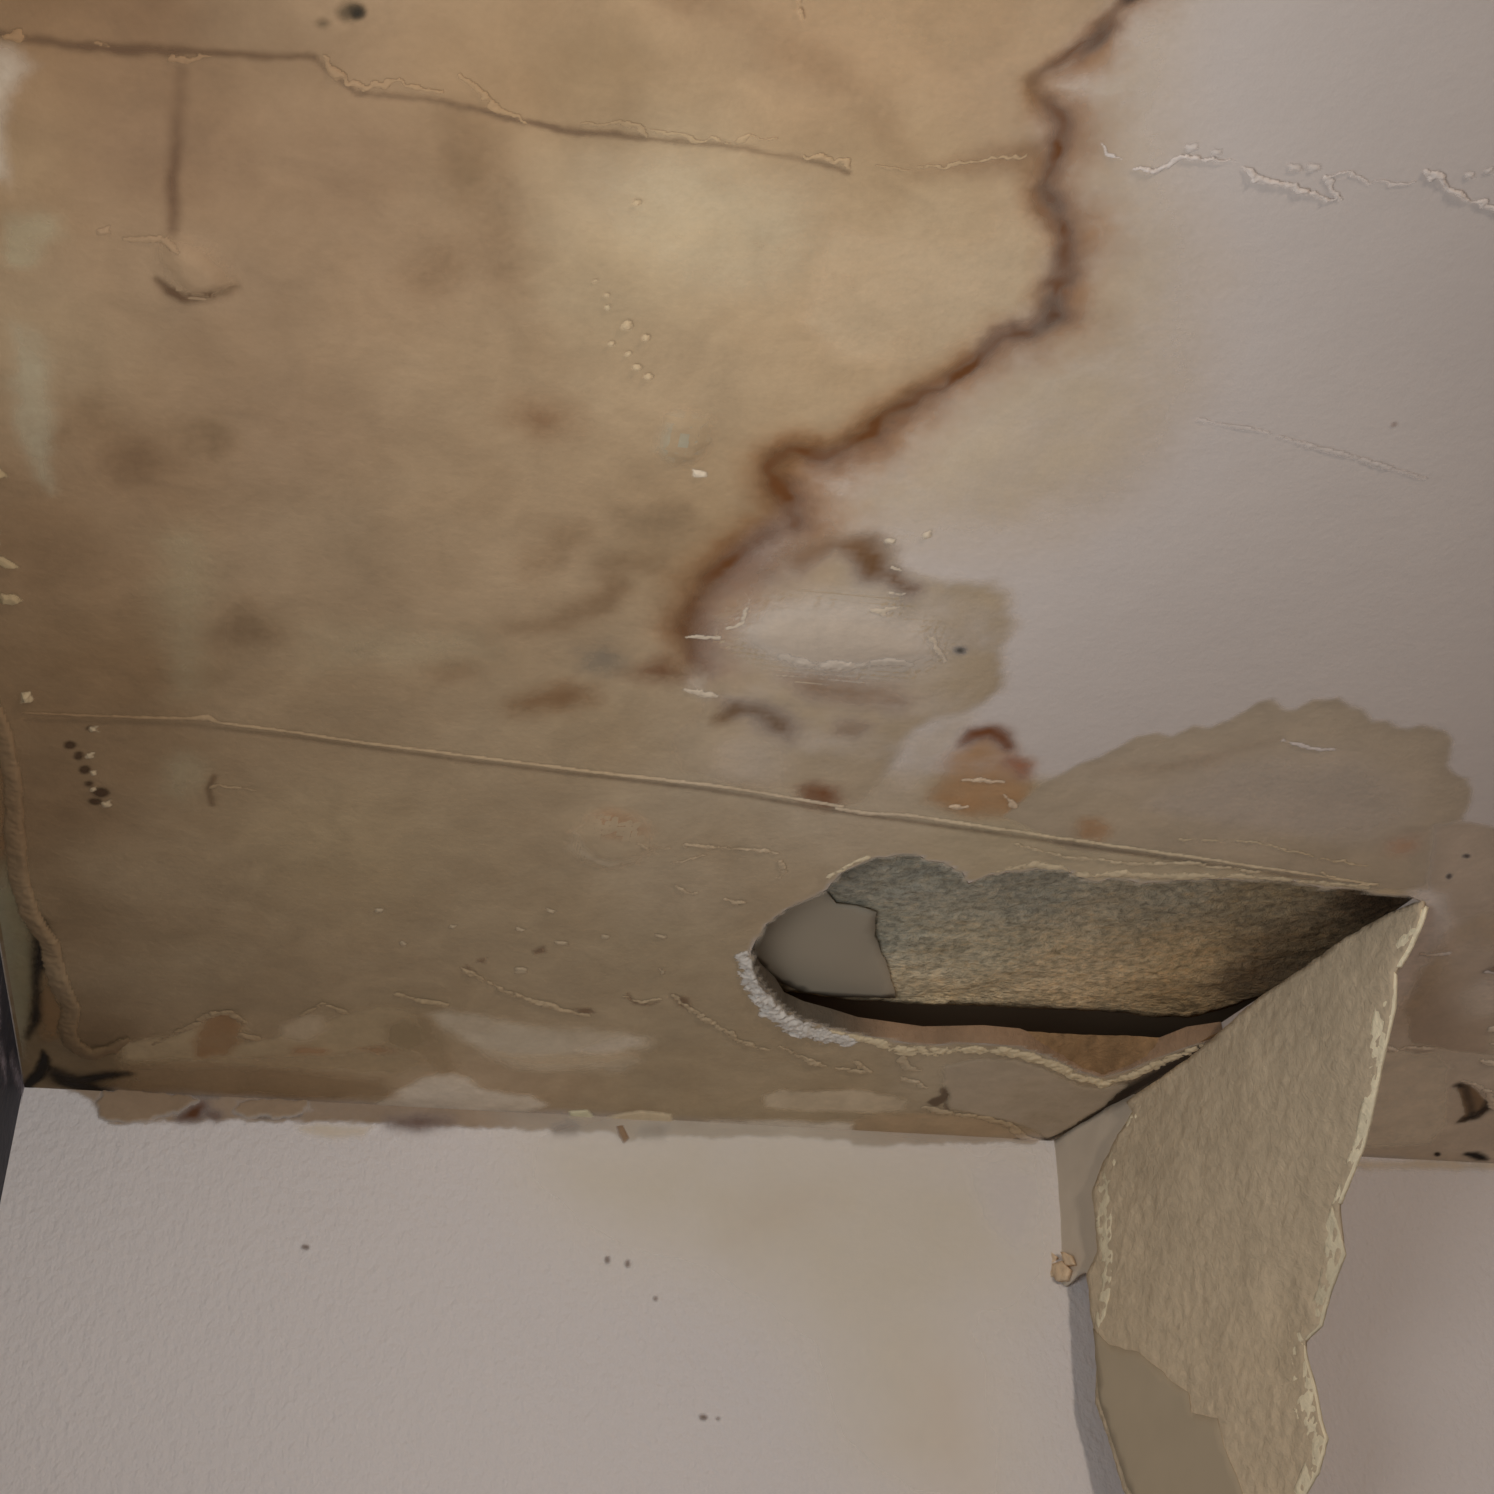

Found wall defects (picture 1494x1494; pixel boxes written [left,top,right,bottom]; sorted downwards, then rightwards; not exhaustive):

crack [0,28,1027,171]
crack [1101,143,1494,211]
leakage [0,0,1494,1163]
crack [23,712,1379,886]
crack [24,925,130,1091]